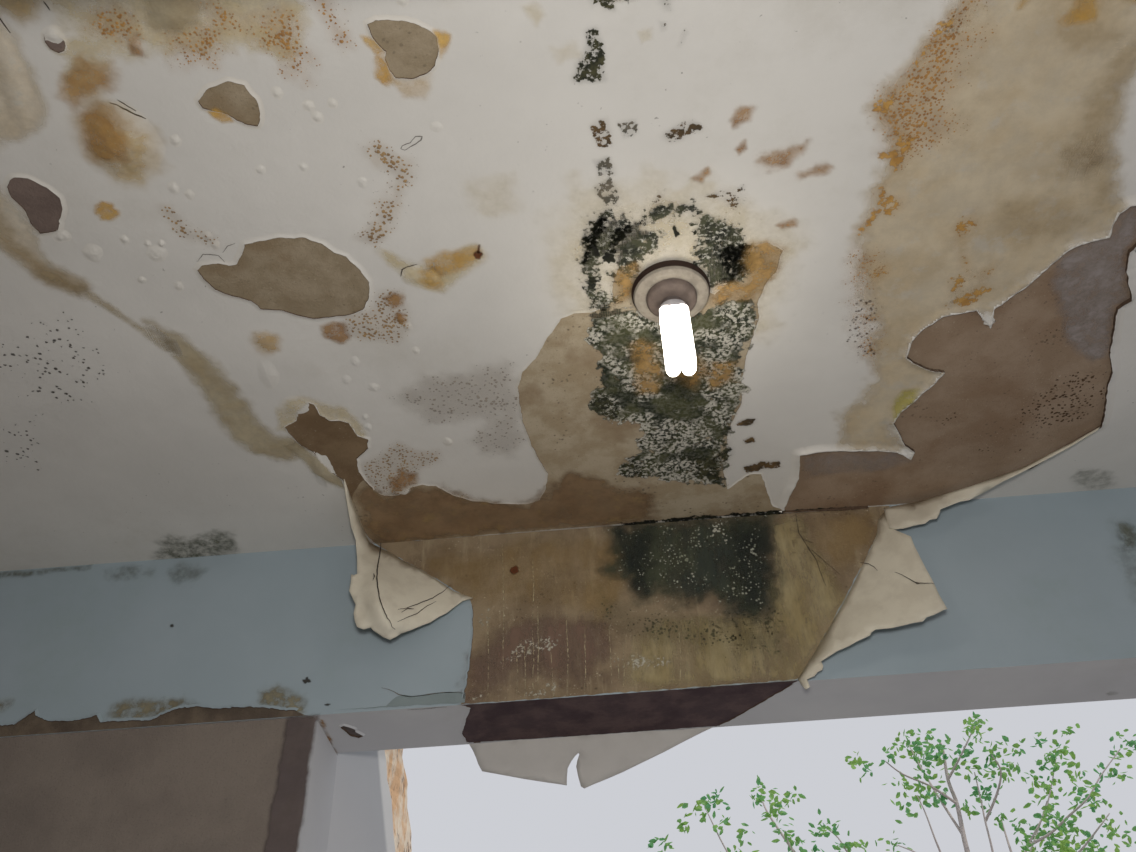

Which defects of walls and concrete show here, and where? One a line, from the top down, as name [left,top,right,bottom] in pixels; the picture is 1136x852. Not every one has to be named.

peeling [363,14,444,83]
mould [573,29,605,83]
mould [593,0,629,9]
peeling [193,76,265,129]
peeling [2,172,68,236]
damp [841,0,1136,449]
peeling [192,232,375,322]
mould [579,120,780,487]
damp [157,329,343,487]
peeling [281,194,1136,788]
mould [602,506,846,658]
peeling [0,704,306,737]